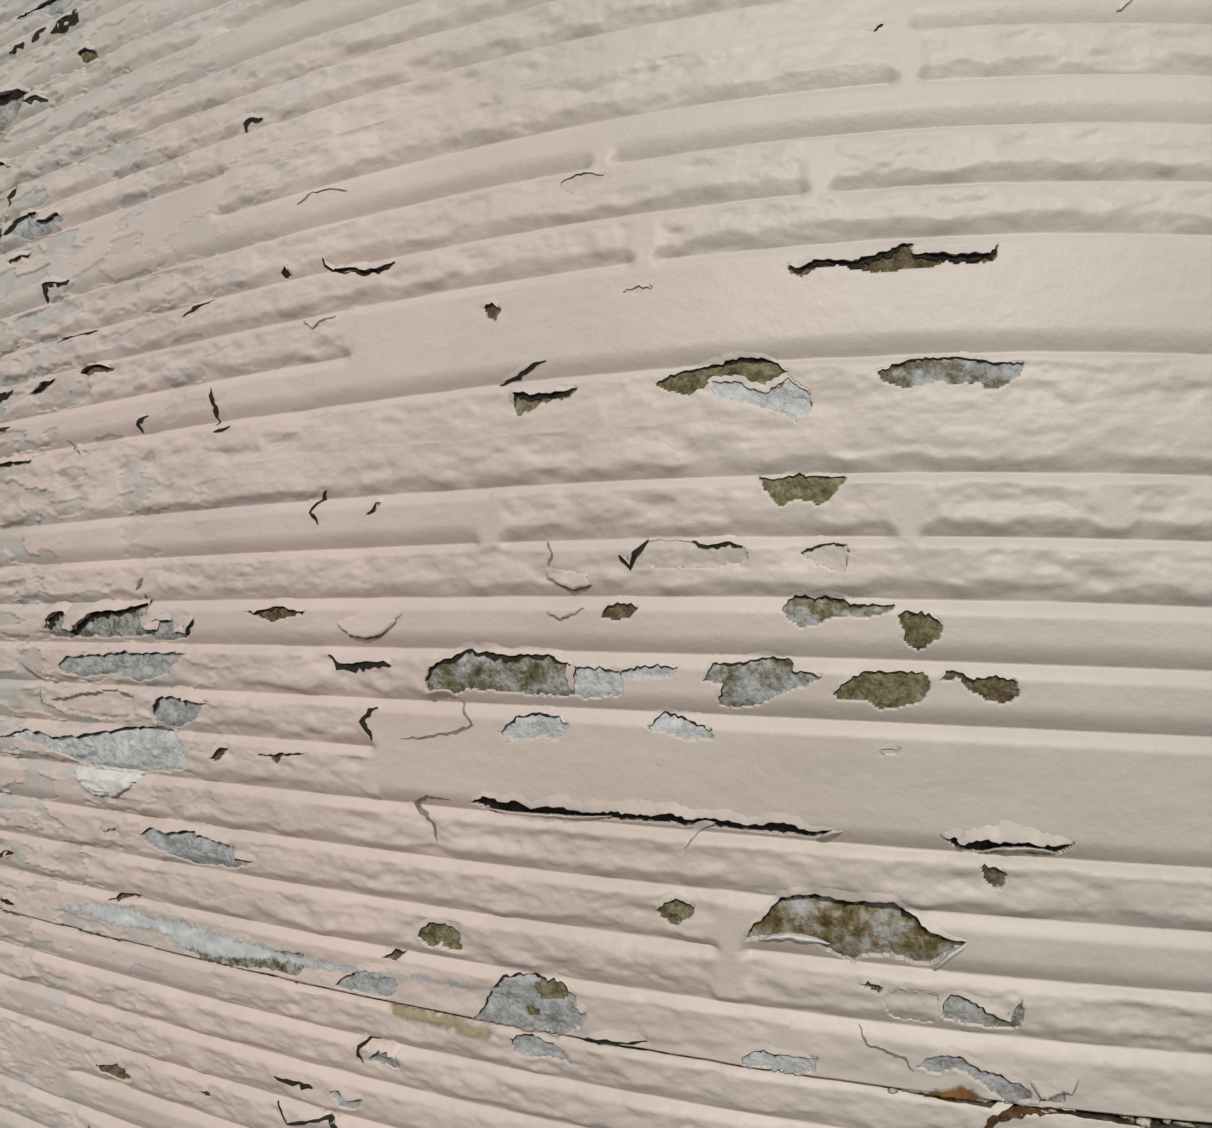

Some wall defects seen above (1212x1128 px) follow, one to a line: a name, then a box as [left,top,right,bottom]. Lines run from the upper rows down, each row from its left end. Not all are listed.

peeling [787,241,999,277]
peeling [655,351,811,422]
peeling [877,351,1024,389]
peeling [758,468,846,506]
peeling [782,590,942,650]
peeling [0,598,206,797]
peeling [424,642,677,742]
peeling [703,650,822,707]
peeling [832,660,1018,709]
peeling [745,886,968,970]
peeling [473,966,647,1063]
crack [981,1099,1075,1128]